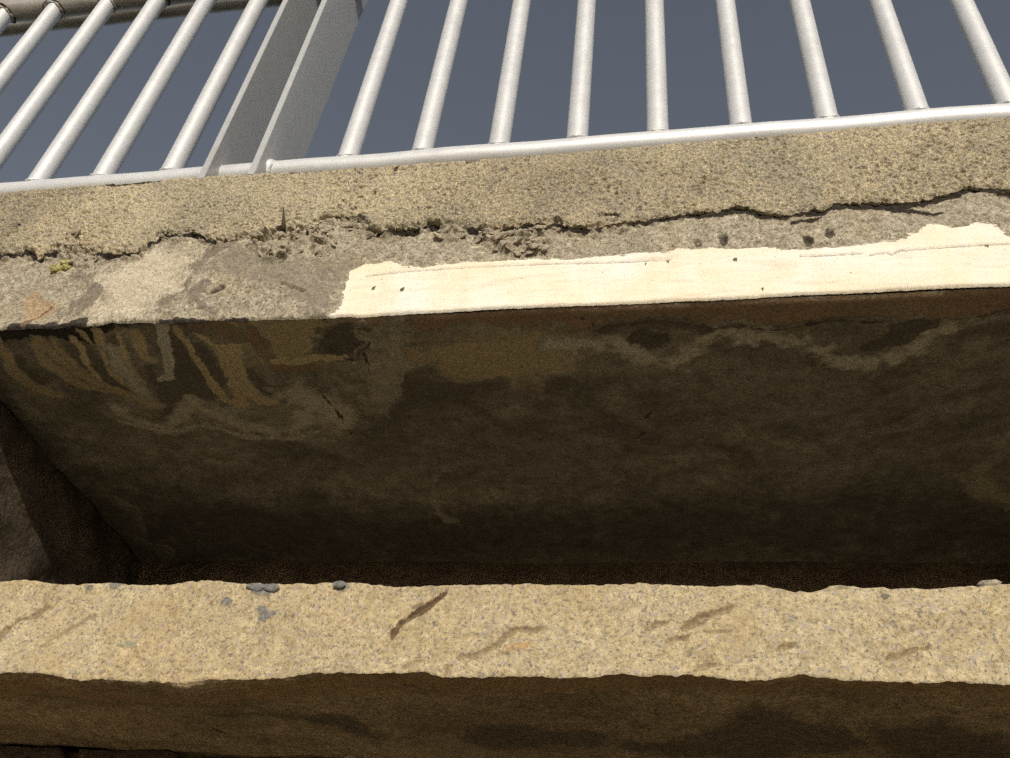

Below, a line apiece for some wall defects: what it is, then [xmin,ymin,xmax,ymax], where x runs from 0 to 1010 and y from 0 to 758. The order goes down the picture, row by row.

crack [0,223,59,264]
spalling [58,228,97,270]
crack [96,231,217,262]
spalling [245,213,374,260]
crack [365,223,601,240]
spalling [433,222,562,257]
spalling [593,212,623,220]
leakage [0,237,1010,564]